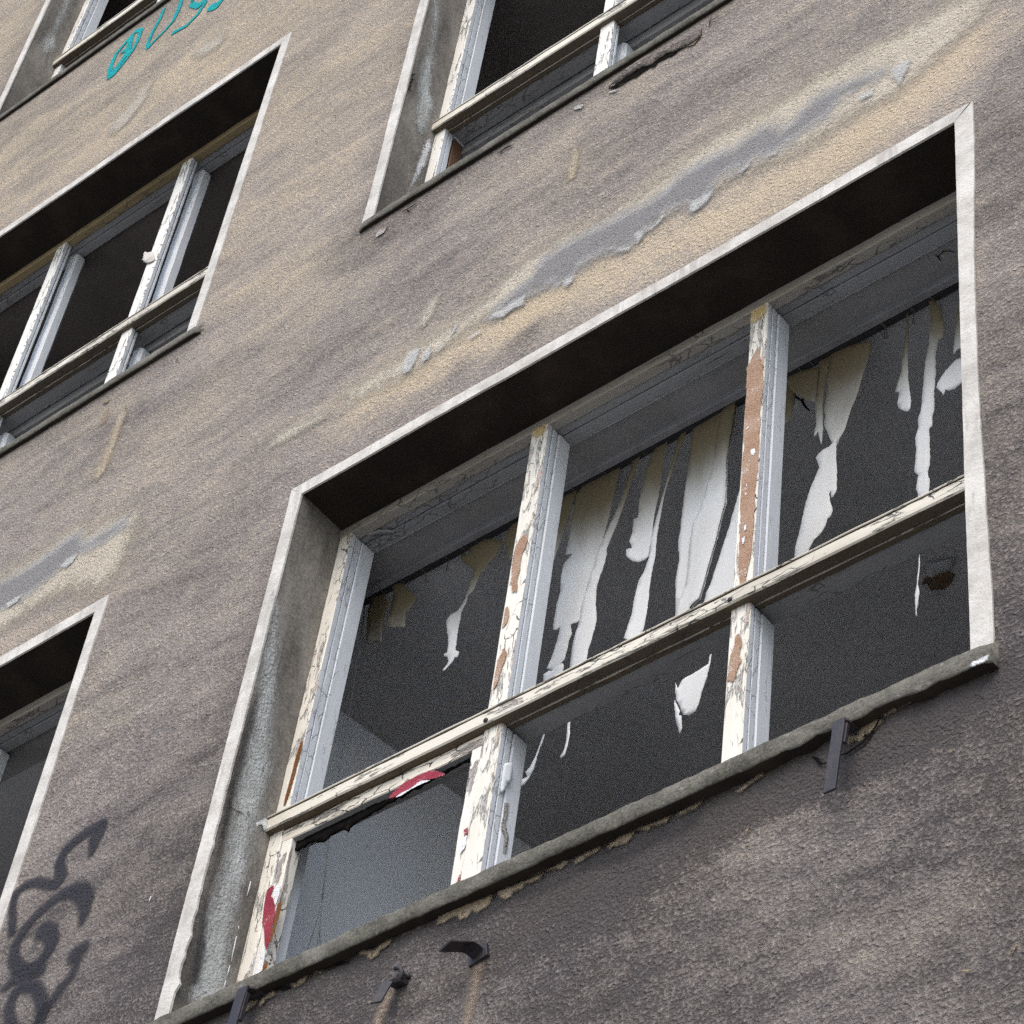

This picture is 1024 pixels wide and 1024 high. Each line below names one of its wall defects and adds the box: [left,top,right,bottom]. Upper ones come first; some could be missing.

flaking render [341,0,992,407]
peeling [738,347,763,584]
peeling [510,534,527,592]
peeling [492,648,507,691]
peeling [726,633,742,682]
peeling [283,741,303,805]
peeling [500,762,513,853]
flaking render [437,802,701,924]
peeling [255,884,282,974]
flaking render [359,939,392,959]